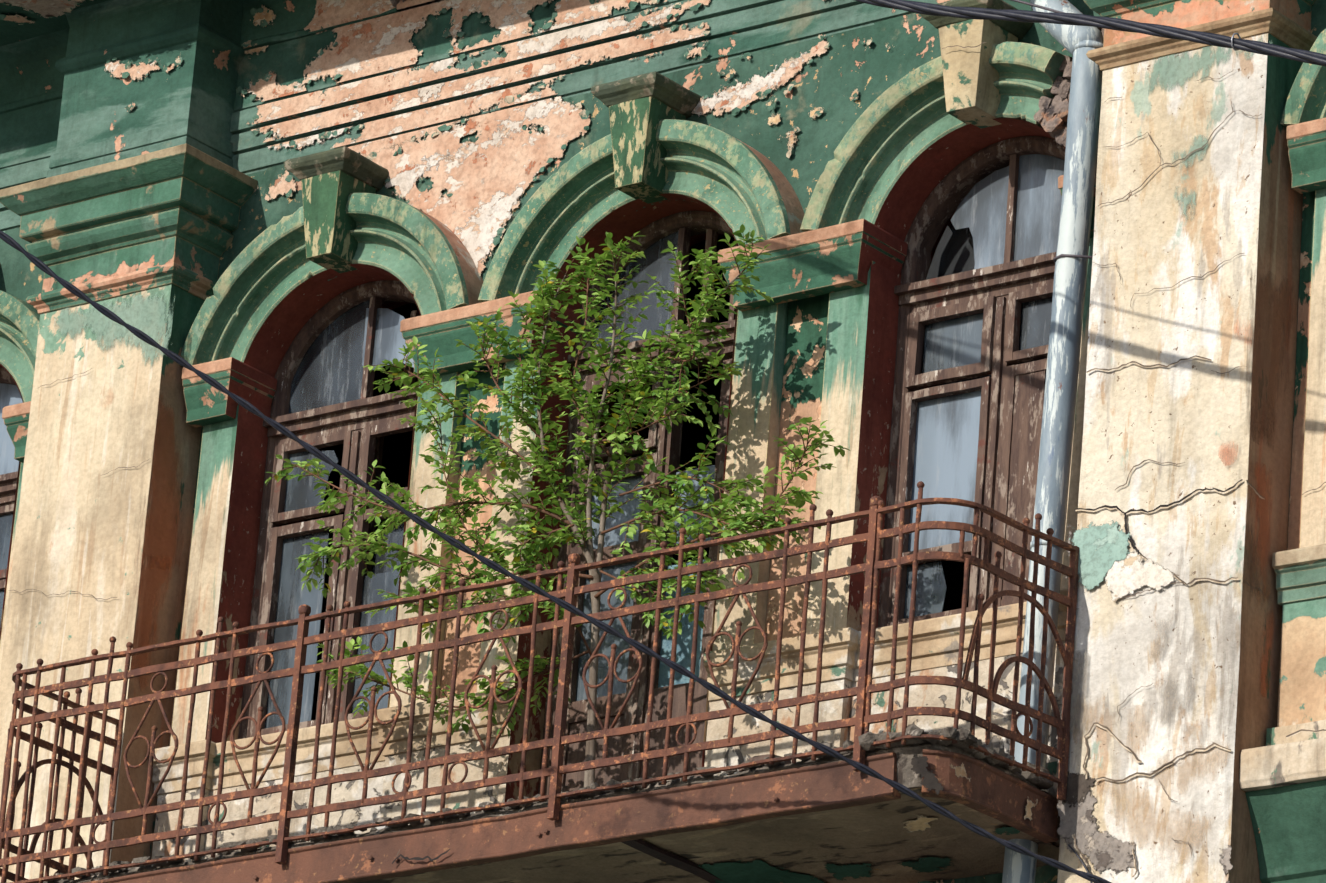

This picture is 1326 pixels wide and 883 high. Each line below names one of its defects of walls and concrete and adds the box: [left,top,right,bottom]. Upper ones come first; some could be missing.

peeling [0,0,93,25]
peeling [236,0,710,276]
peeling [691,34,830,158]
crack [1087,355,1247,374]
leakage [1246,275,1291,441]
crack [1075,459,1265,597]
leakage [1247,529,1258,585]
rust [951,763,971,781]
rust [1024,798,1038,821]
flaking render [1056,759,1136,875]
crack [1131,849,1139,877]
crack [1082,683,1231,802]